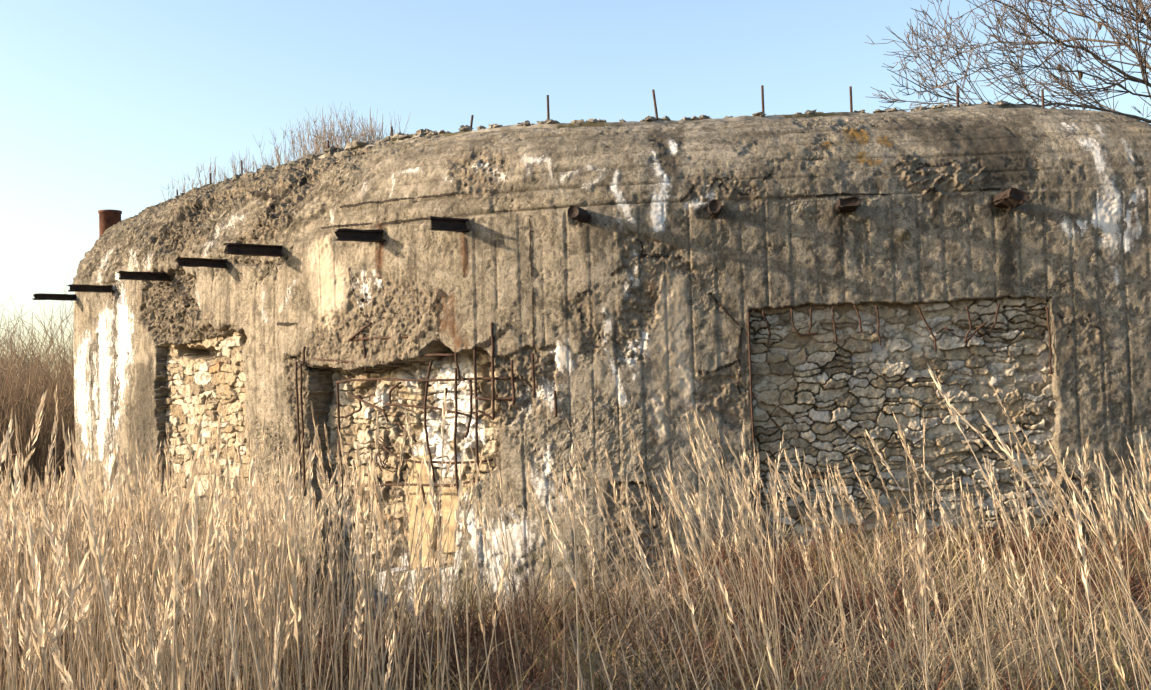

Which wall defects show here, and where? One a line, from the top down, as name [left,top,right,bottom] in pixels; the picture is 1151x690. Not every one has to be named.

damp [521,154,635,224]
damp [648,128,682,232]
damp [683,185,717,210]
crack [680,173,774,203]
efflorescence [1061,122,1146,282]
damp [74,249,168,504]
spalling [282,223,701,512]
damp [527,443,567,512]
damp [372,493,549,616]